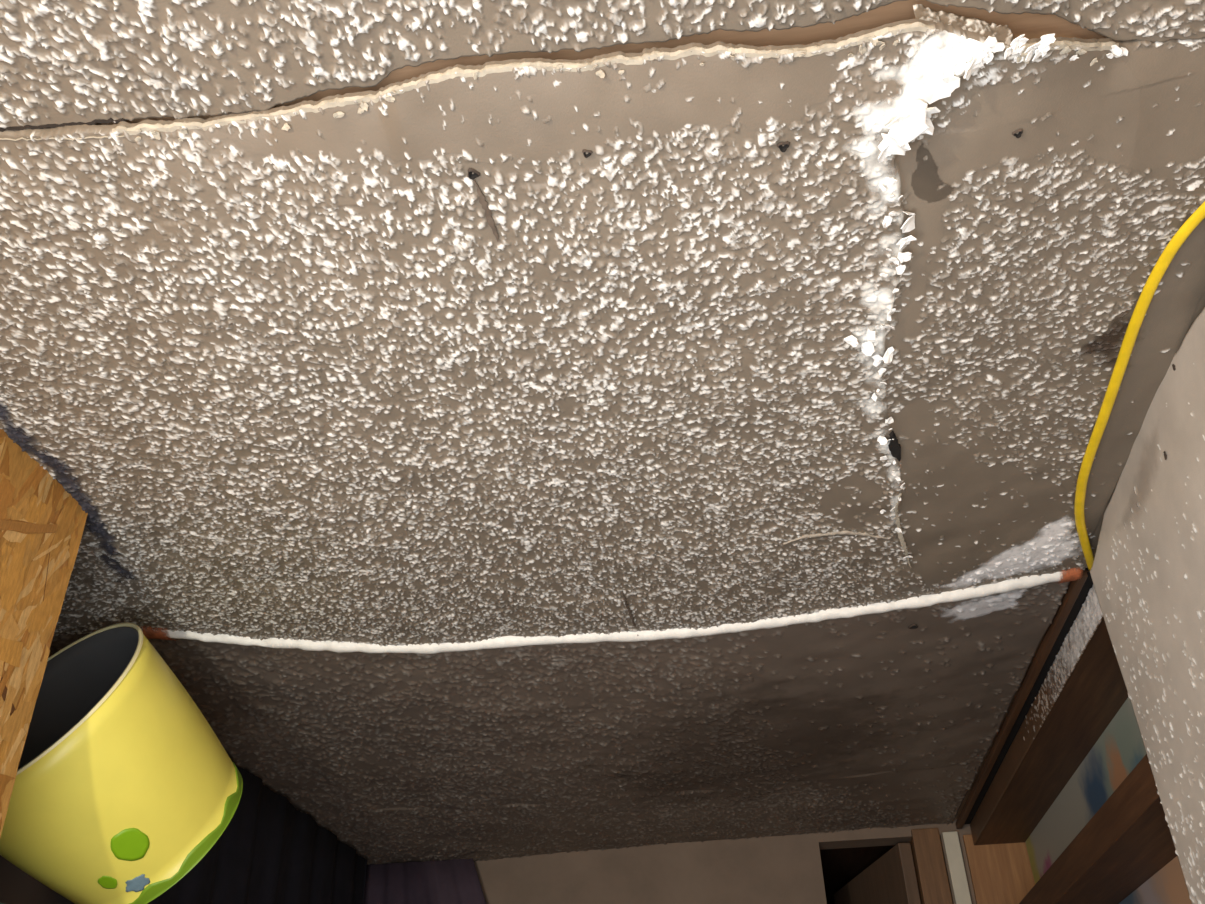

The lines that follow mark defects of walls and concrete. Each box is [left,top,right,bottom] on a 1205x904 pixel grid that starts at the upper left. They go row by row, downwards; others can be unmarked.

crack [0,22,934,142]
spalling [844,42,1205,364]
spalling [815,393,1073,588]